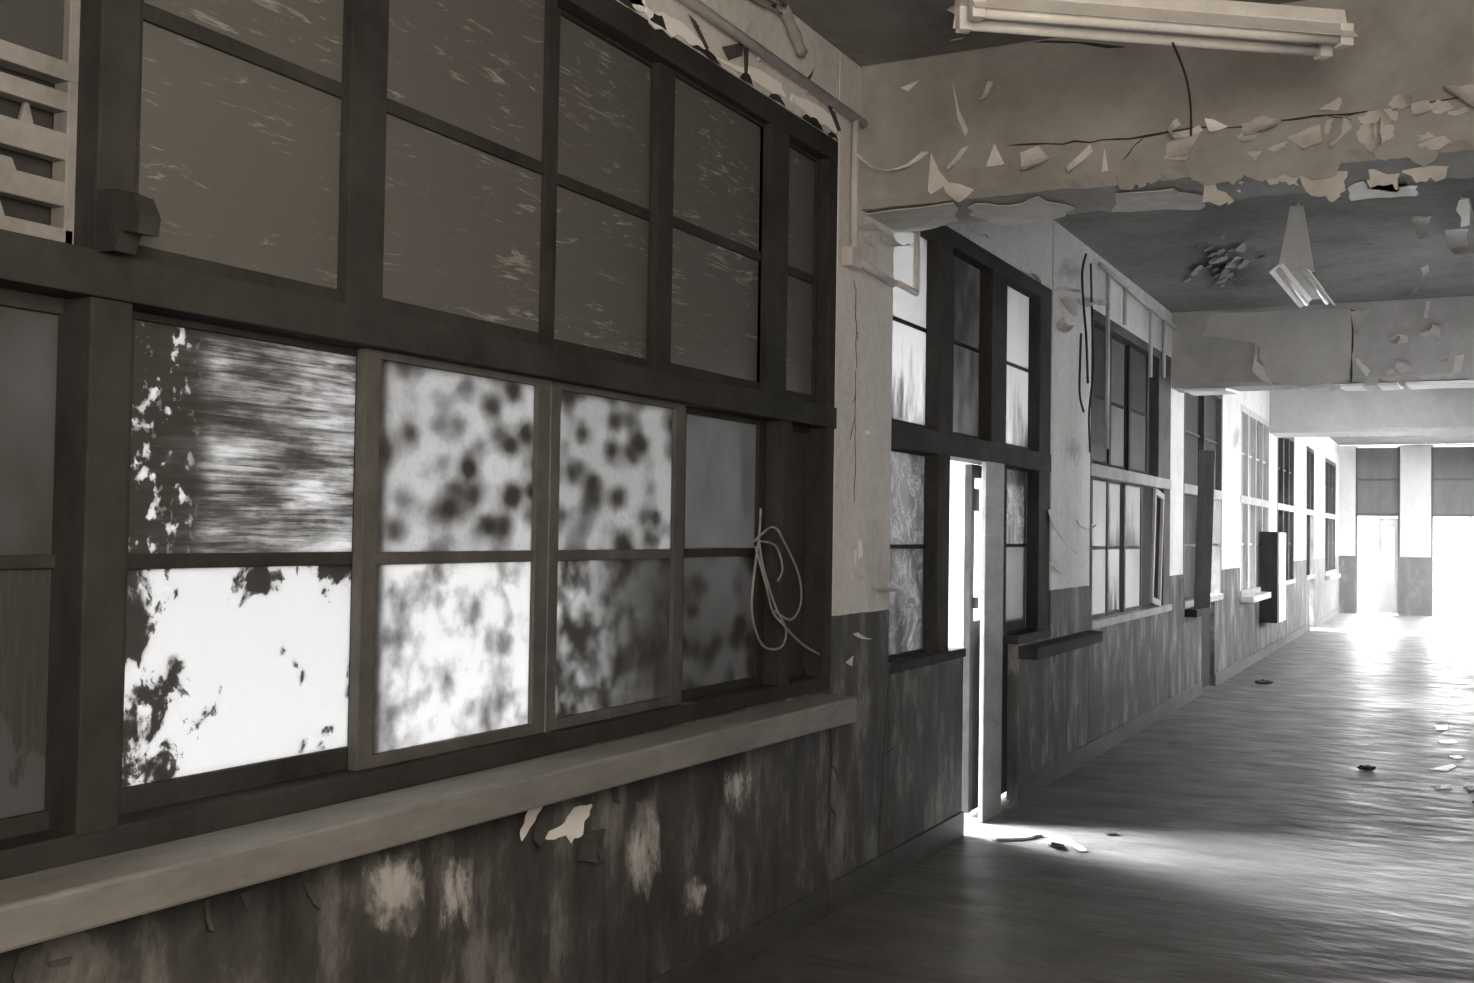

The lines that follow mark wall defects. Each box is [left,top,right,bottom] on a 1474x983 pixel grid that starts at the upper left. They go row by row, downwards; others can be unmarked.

flaking render [616,0,841,141]
spalling [854,81,1075,247]
crack [1006,126,1242,162]
peeling [1066,84,1474,212]
crack [1281,97,1458,121]
peeling [1412,195,1474,255]
peeling [1182,236,1264,288]
damp [628,810,659,885]
damp [369,857,423,929]
damp [440,861,472,923]